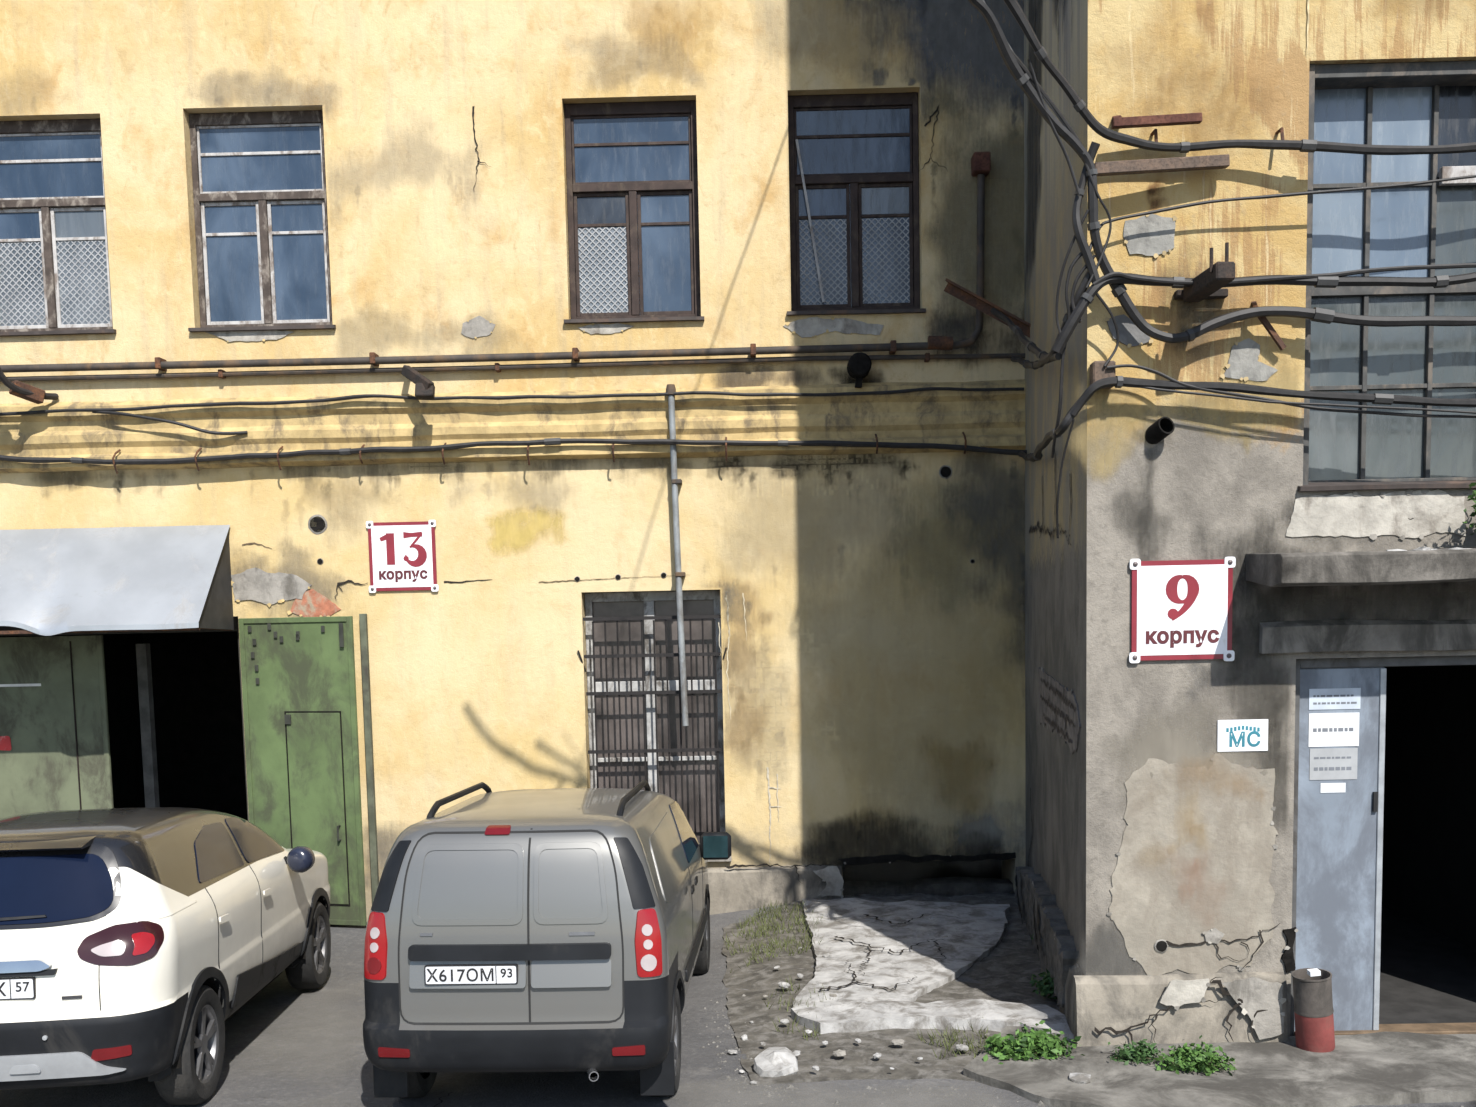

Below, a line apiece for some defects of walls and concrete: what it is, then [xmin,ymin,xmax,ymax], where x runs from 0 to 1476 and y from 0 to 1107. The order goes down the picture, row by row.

water stain [866,0,1065,322]
flaking render [1123,214,1178,258]
flaking render [783,317,884,338]
flaking render [1220,338,1278,382]
spalling [308,515,328,534]
flaking render [231,567,341,617]
flaking render [1106,753,1299,1040]
crack [1094,923,1280,1045]